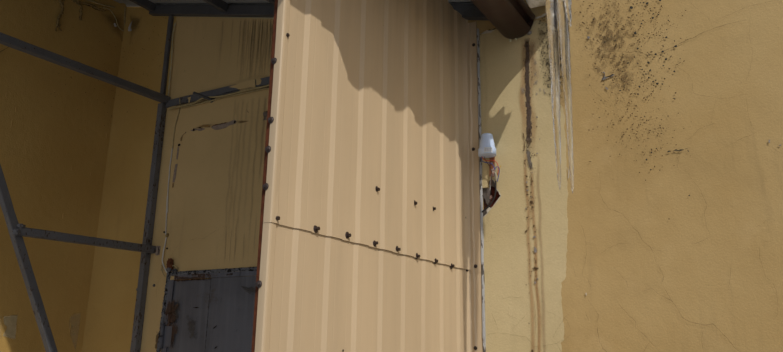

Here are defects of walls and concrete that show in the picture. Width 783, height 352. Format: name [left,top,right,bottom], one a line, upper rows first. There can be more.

rust [523,37,540,285]
damp [538,0,686,171]